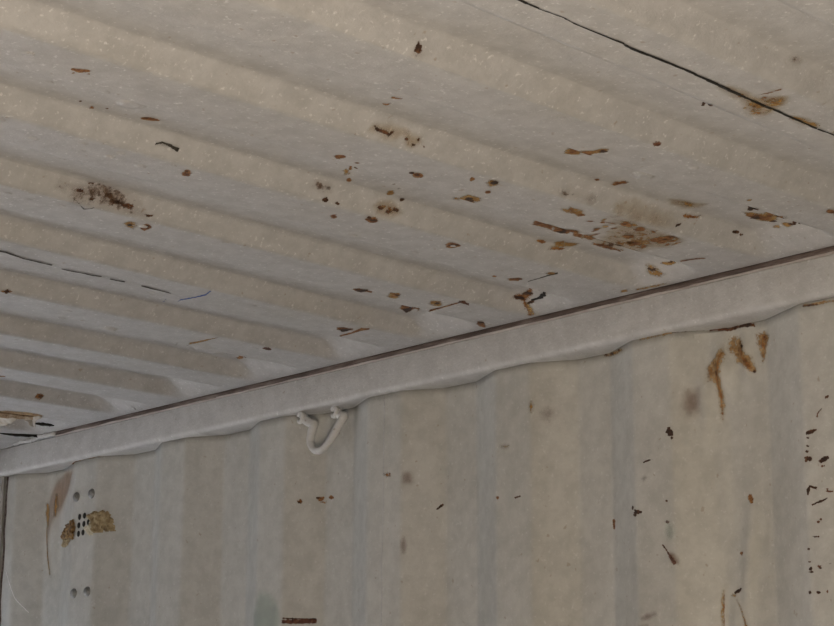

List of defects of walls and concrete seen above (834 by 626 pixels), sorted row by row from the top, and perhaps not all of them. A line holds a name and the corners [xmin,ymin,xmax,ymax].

crack [518,0,834,136]
corrosion [77,182,134,209]
corrosion [365,190,405,223]
corrosion [454,180,498,203]
corrosion [534,208,681,252]
corrosion [707,323,769,415]